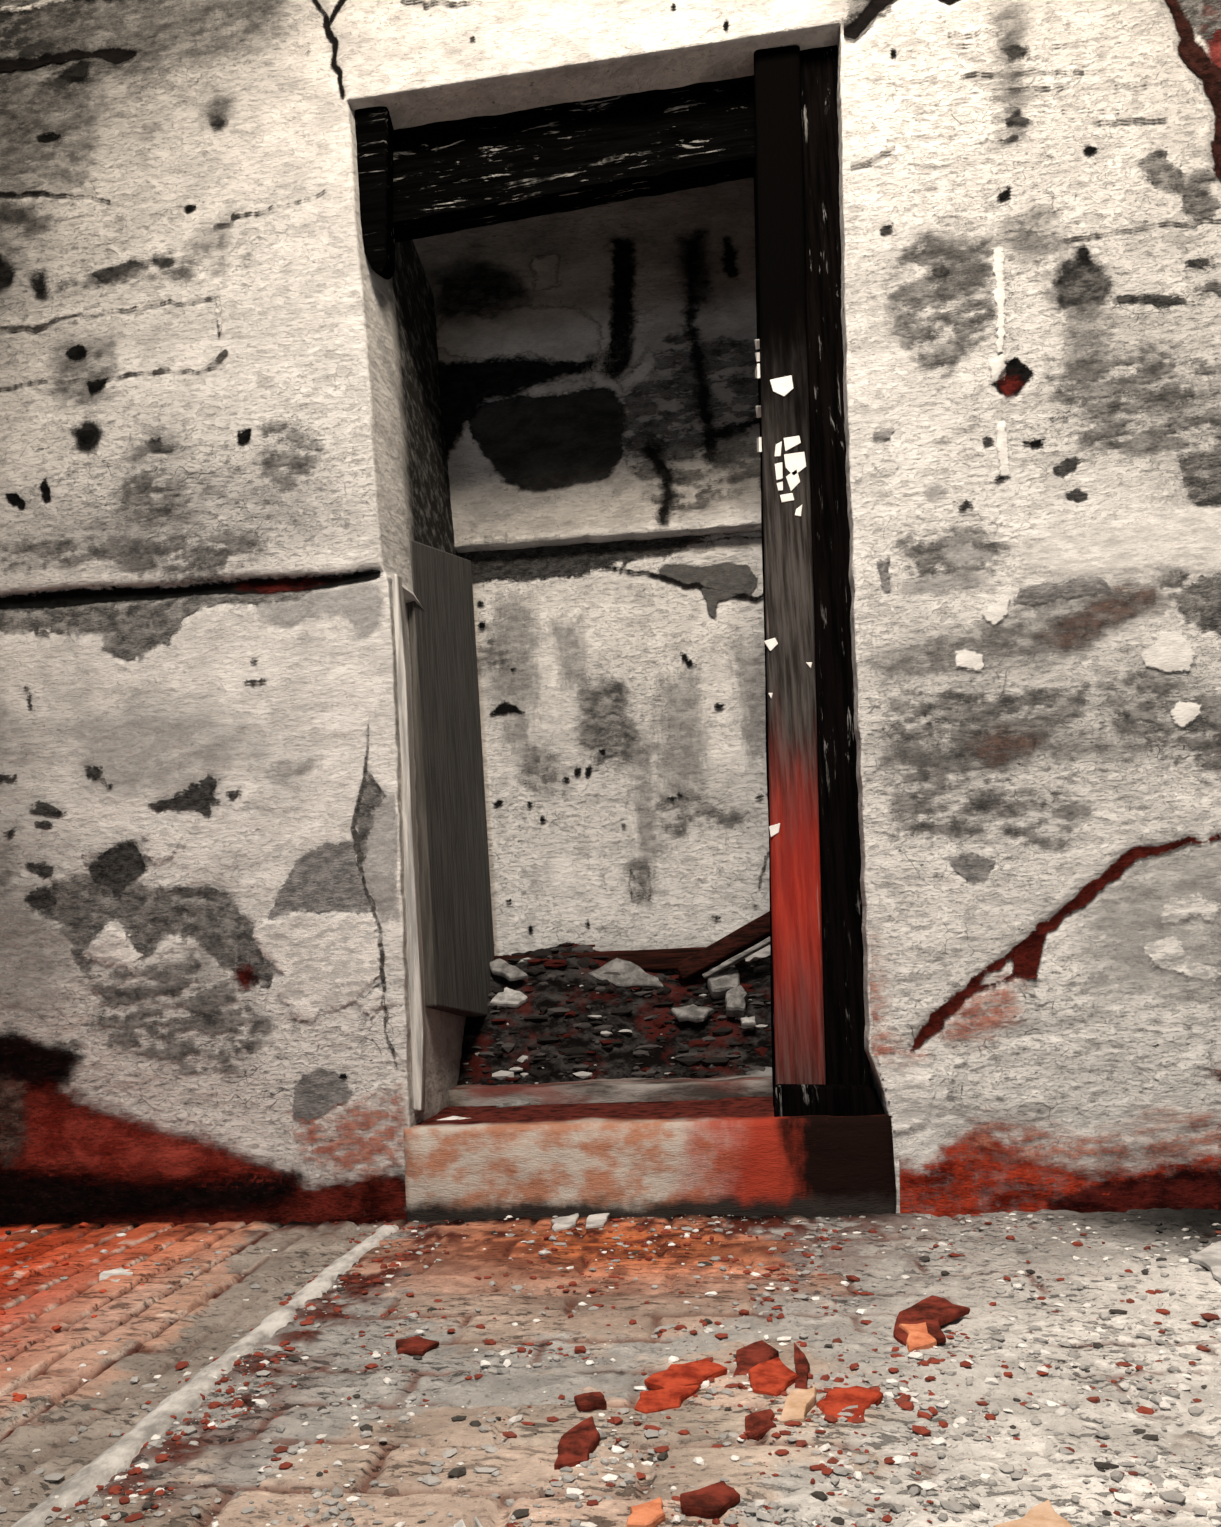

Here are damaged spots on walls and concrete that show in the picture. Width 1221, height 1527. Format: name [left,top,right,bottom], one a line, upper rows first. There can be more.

crack [313,0,345,97]
crack [844,0,894,39]
crack [944,0,1166,124]
crack [1166,0,1221,180]
flaking render [1177,0,1221,68]
crack [1064,219,1221,242]
spalling [988,354,1034,397]
crack [0,569,382,610]
flaking render [244,658,266,685]
flaking render [85,765,113,789]
flaking render [0,774,398,990]
crack [910,833,1221,1052]